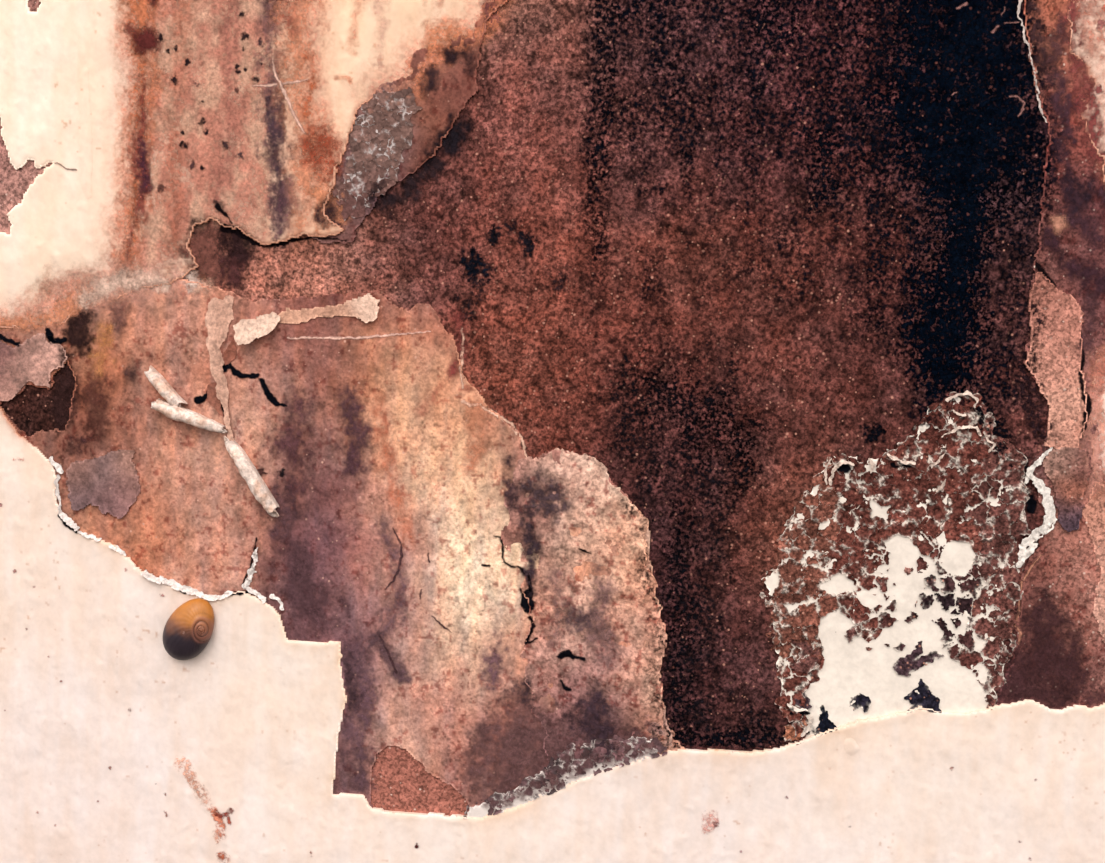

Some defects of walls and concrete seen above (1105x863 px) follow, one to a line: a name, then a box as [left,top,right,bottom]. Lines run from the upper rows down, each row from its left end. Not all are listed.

corrosion [373,0,503,95]
corrosion [1059,0,1105,213]
peeling [0,117,53,234]
crack [215,203,347,247]
corrosion [447,313,466,377]
peeling [144,295,281,517]
peeling [828,459,854,486]
corrosion [1086,352,1105,498]
crack [481,536,538,645]
corrosion [177,758,234,860]
spalling [371,746,468,816]
peeling [463,731,667,819]